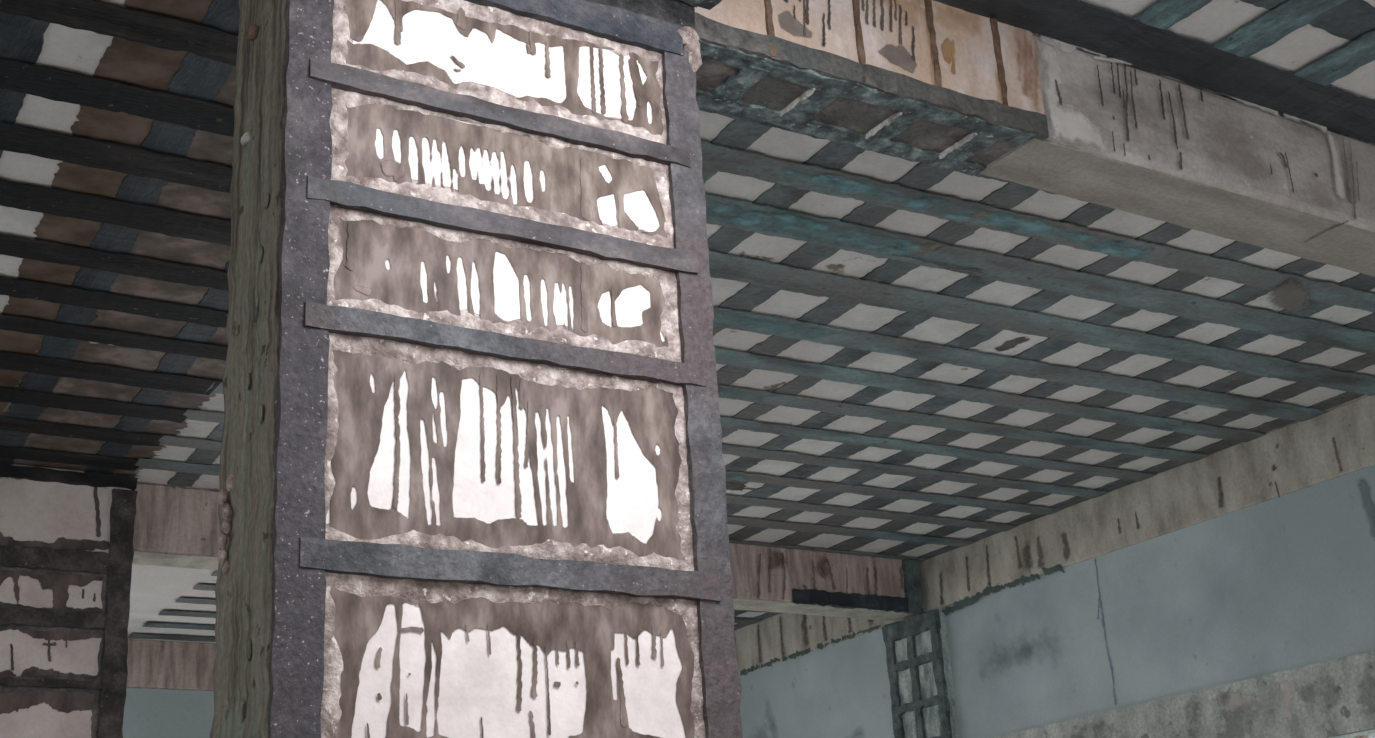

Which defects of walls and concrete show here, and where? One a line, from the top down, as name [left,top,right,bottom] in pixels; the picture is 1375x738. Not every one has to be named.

spalling [933,0,1375,199]
spalling [698,106,1375,561]